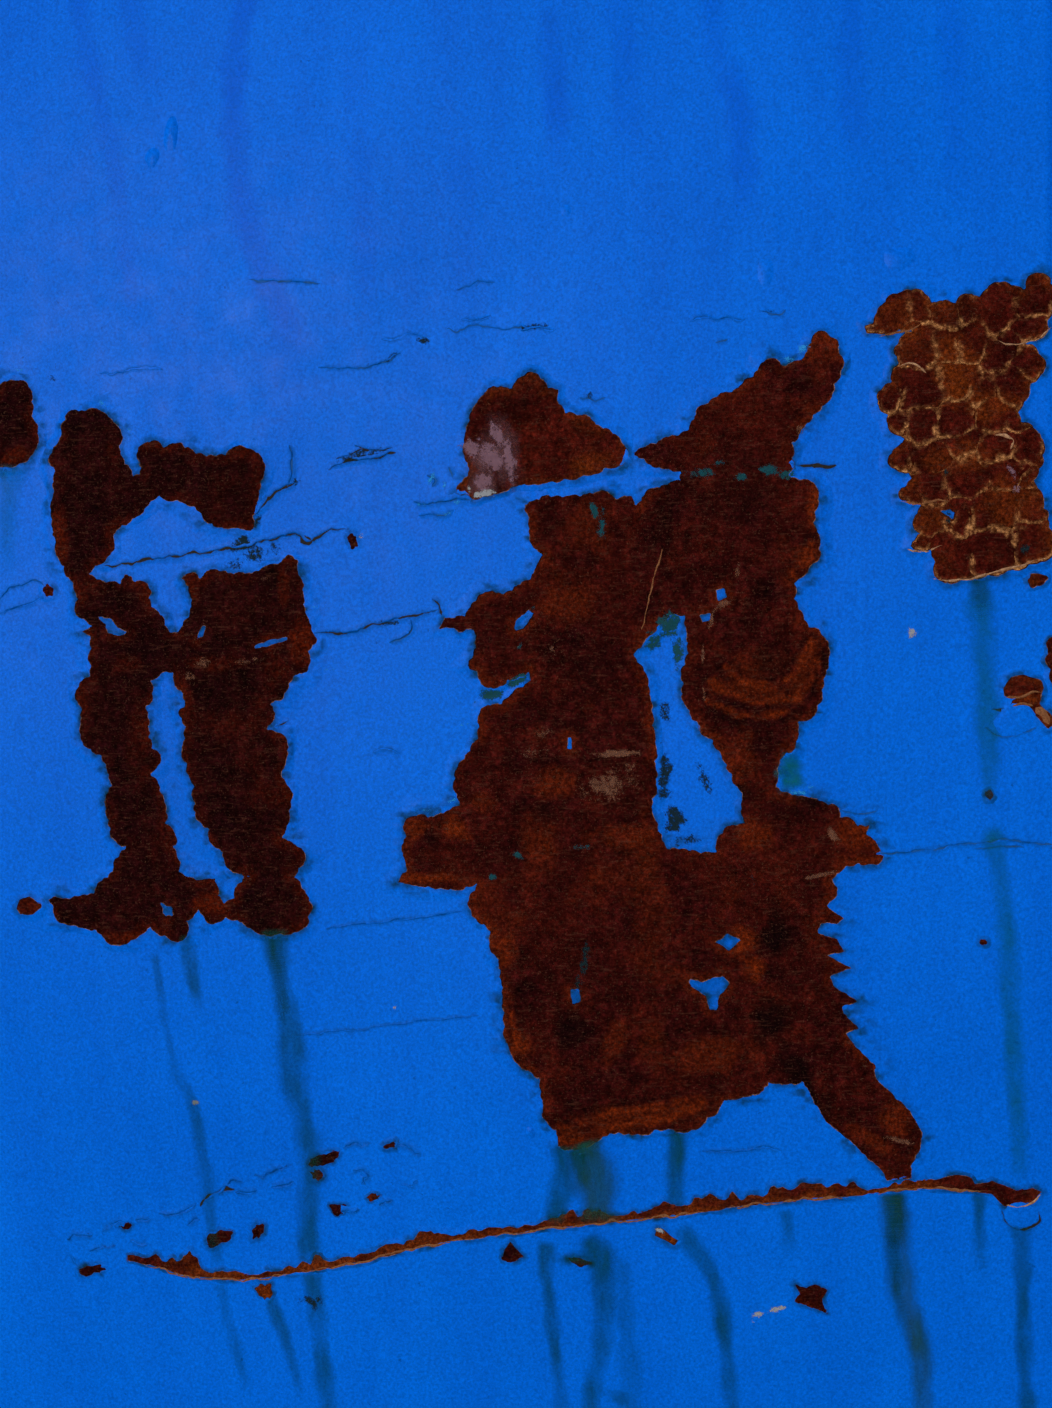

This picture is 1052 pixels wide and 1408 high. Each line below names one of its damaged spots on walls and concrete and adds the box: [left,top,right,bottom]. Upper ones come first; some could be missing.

peeling [304,1147,343,1187]
corrosion [671,1134,683,1172]
peeling [326,1190,383,1218]
peeling [117,1215,136,1234]
peeling [202,1218,269,1253]
peeling [73,1260,109,1282]
corrosion [909,1316,926,1359]